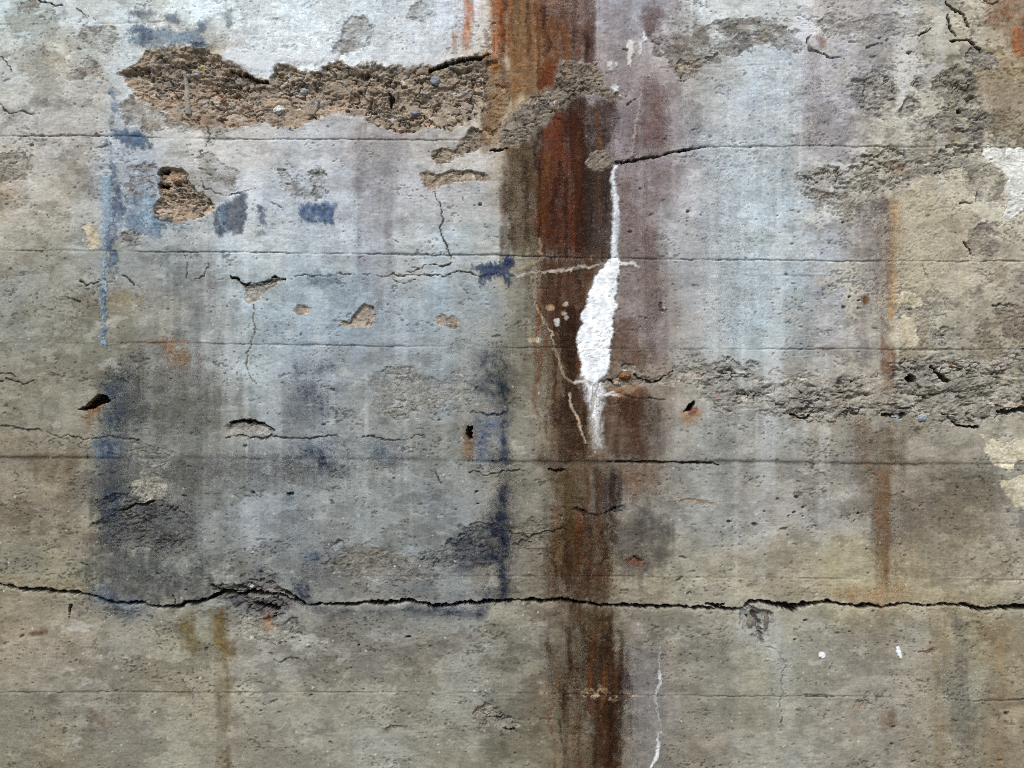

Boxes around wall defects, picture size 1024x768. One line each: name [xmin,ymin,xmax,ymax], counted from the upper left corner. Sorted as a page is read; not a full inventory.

spalling [81,151,240,276]
spalling [103,9,623,191]
corrosion [492,0,596,98]
crack [613,145,710,167]
crack [918,0,999,54]
crack [183,191,498,385]
damp [568,164,638,443]
spalling [224,422,274,439]
corrosion [500,97,636,768]
corrosion [600,379,660,459]
spalling [605,266,1024,511]
crack [0,582,1024,727]